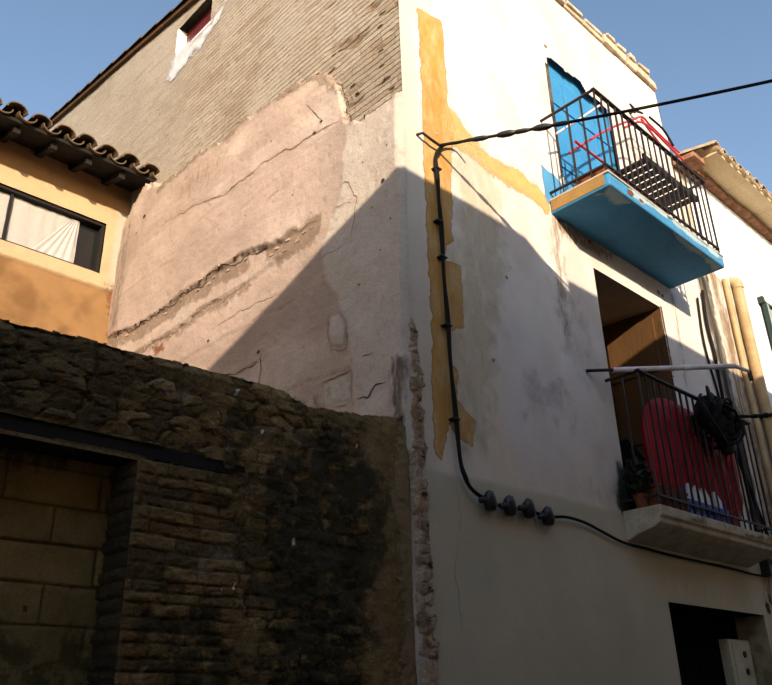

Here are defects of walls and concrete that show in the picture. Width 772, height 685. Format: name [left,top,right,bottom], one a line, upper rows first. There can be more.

crack [167,104,336,221]
peeling [158,46,359,191]
crack [333,382,385,409]
peeling [391,8,550,685]